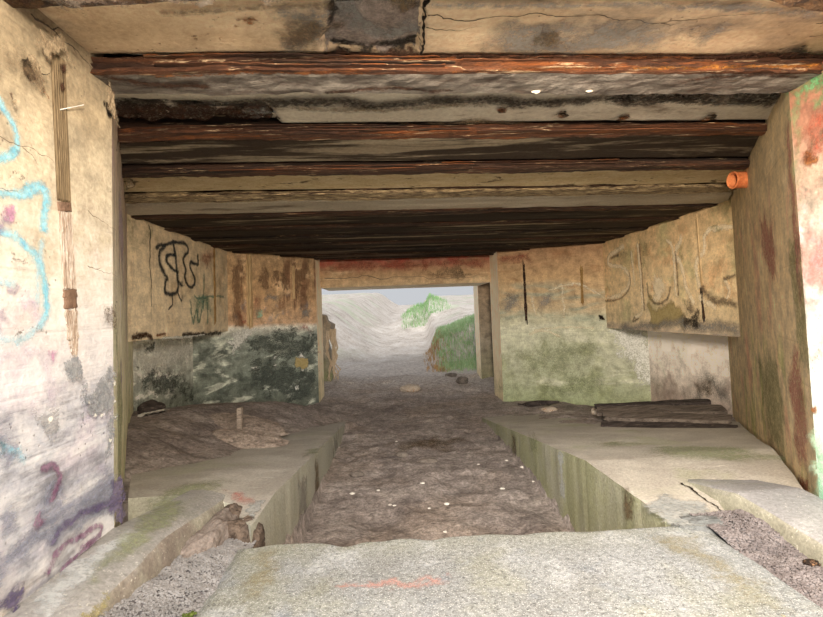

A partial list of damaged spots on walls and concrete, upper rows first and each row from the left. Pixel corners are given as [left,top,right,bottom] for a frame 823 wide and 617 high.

spalling [320,0,424,54]
crack [420,0,795,56]